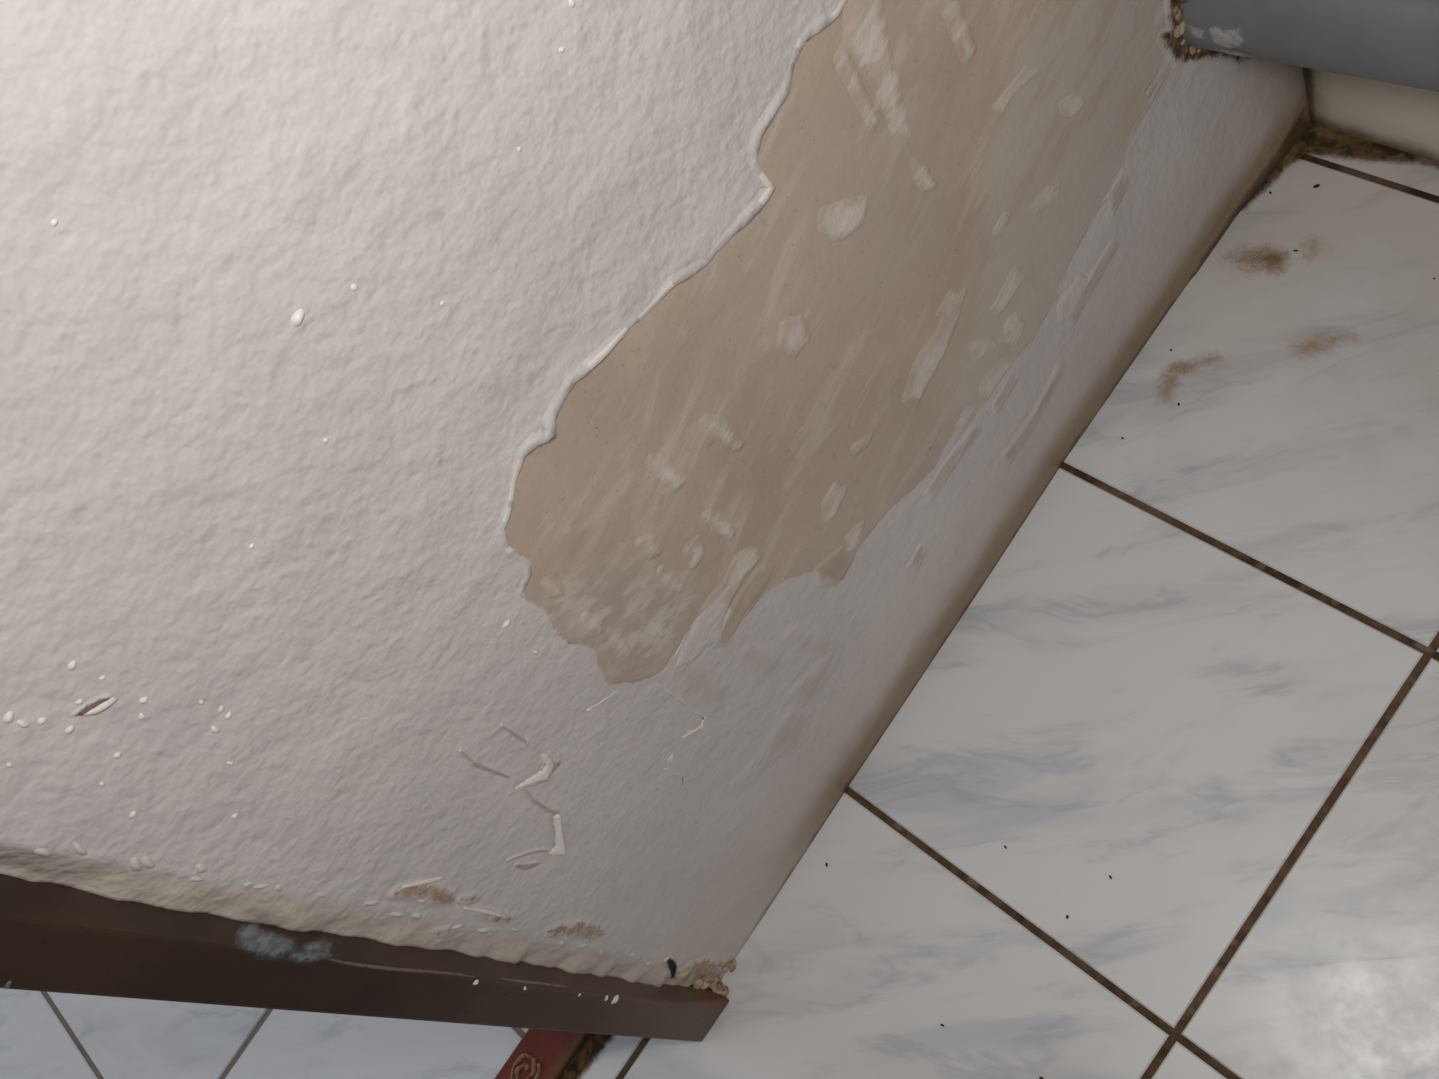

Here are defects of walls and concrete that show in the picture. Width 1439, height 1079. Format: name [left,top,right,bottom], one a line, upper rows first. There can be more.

peeling [442,0,1256,731]